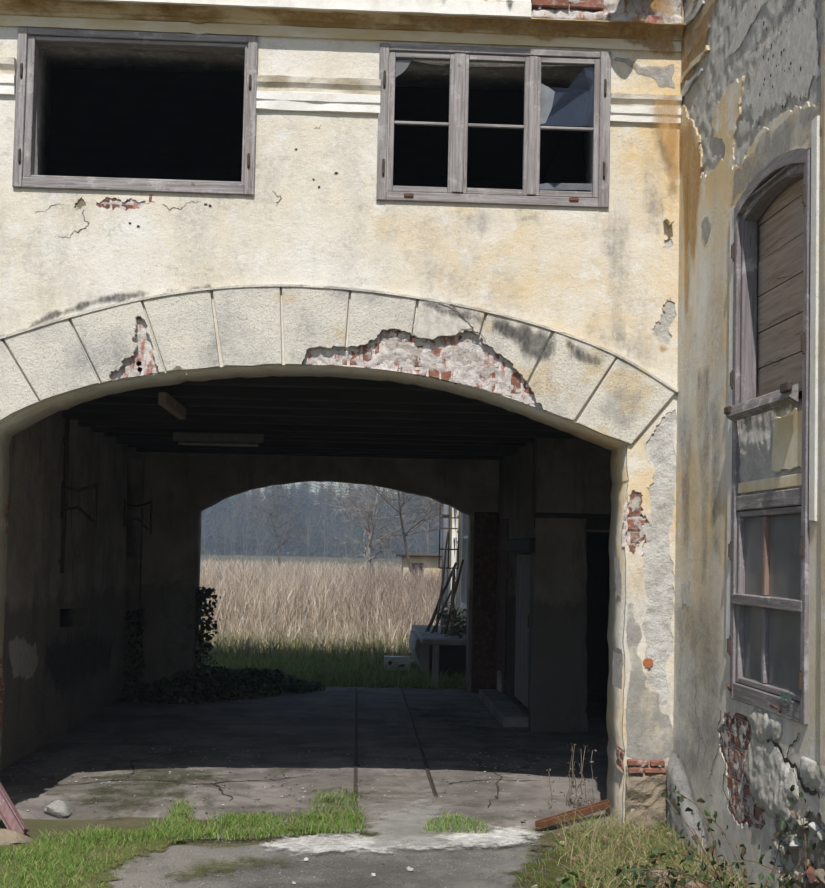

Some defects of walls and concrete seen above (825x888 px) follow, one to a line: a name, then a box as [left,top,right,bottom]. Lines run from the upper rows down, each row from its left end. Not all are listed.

flaking render [614,0,824,177]
flaking render [74,194,153,211]
flaking render [110,317,160,380]
flaking render [302,329,542,413]
flaking render [651,297,677,344]
flaking render [614,410,691,709]
peeling [0,635,39,726]
flaking render [612,647,623,690]
crack [694,686,733,813]
flaking render [720,711,825,888]
crack [766,733,820,799]